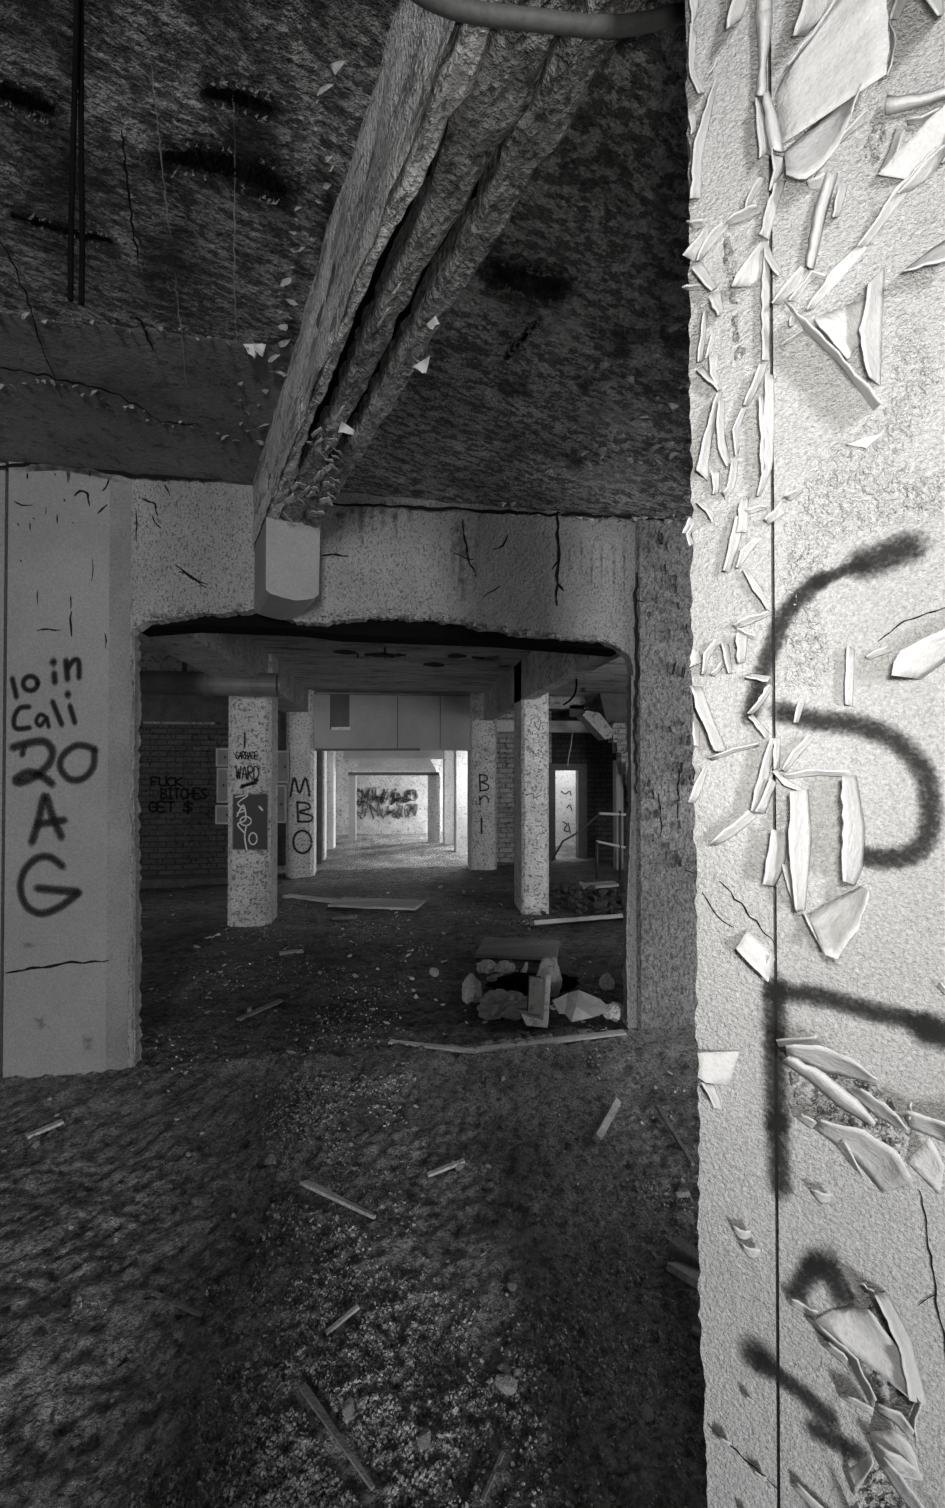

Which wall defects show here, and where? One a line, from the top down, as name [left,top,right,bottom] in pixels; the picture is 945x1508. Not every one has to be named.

spalling [0,61,346,446]
spalling [481,256,576,361]
crack [332,502,680,606]
peeling [497,0,945,1022]
crack [5,960,109,974]
peeling [732,1225,761,1259]
peeling [812,1189,832,1204]
crack [918,1190,945,1351]
peeling [789,1283,929,1508]